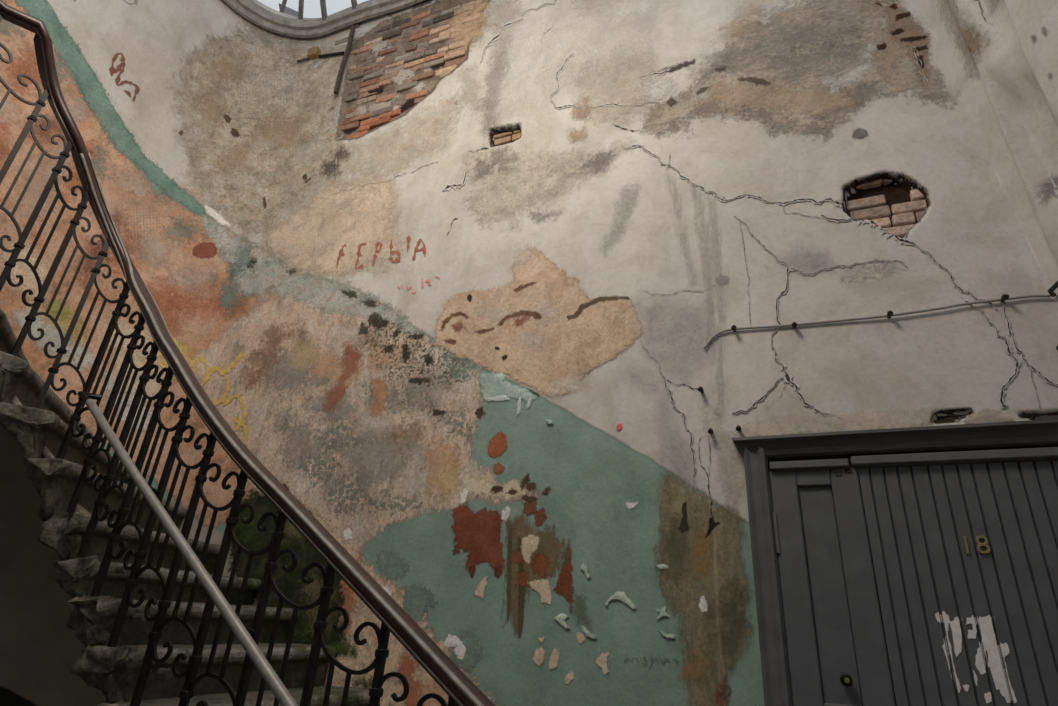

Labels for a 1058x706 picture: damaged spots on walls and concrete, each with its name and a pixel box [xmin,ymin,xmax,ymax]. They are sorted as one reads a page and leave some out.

crack [480,0,557,63]
flaking render [465,0,957,223]
crack [550,53,1058,418]
spalling [843,172,930,238]
peeling [0,0,643,706]
crack [640,340,714,523]
damp [653,335,752,706]